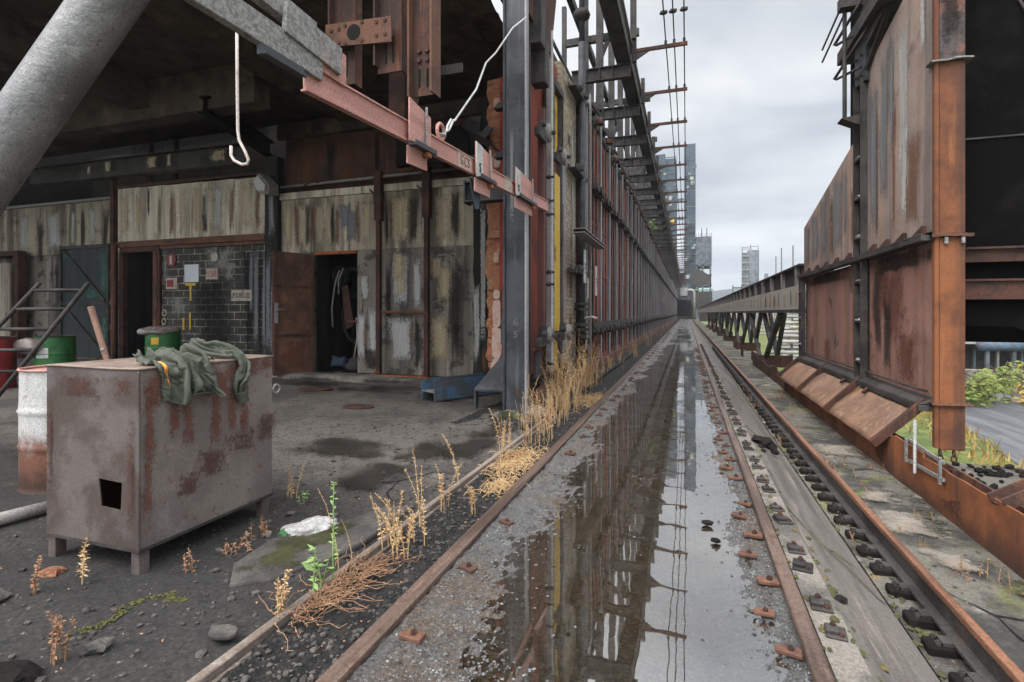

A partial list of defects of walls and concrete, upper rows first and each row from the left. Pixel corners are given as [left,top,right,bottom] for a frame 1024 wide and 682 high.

damp [268,195,370,245]
damp [357,194,466,368]